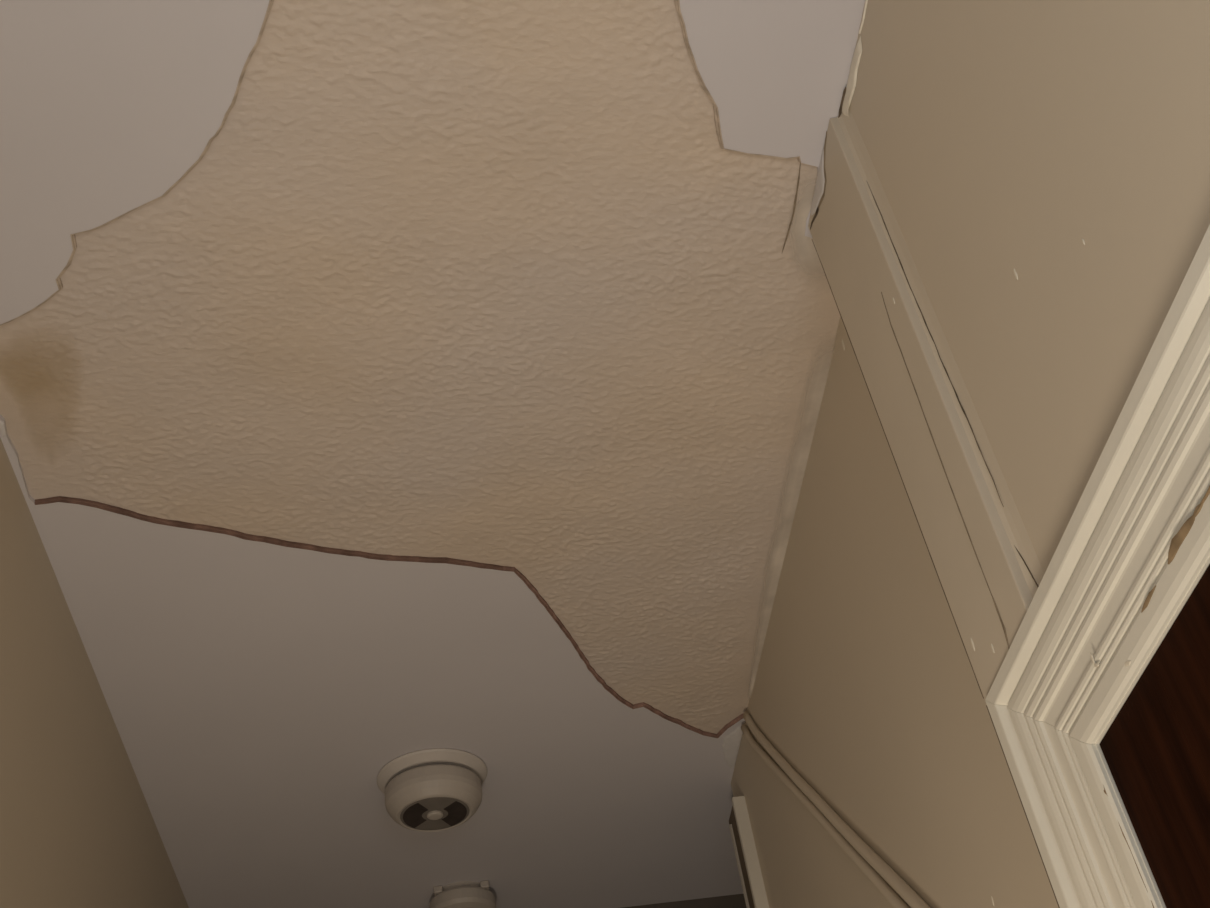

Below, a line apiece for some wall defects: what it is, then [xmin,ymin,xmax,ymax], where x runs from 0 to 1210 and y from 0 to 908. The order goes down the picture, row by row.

peeling [0,0,845,738]
spalling [1168,486,1210,564]
spalling [1141,586,1156,613]